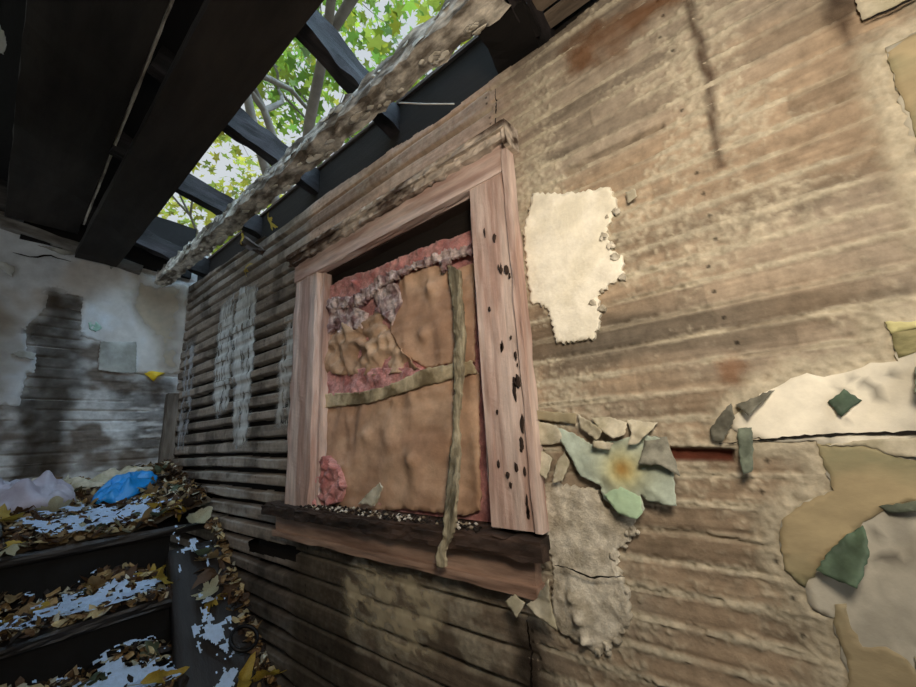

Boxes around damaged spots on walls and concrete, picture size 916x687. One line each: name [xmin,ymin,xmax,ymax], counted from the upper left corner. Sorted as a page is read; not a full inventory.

crack [863,0,912,21]
spalling [523,187,637,345]
leakage [12,292,81,481]
leakage [134,281,194,449]
leakage [213,287,256,446]
leakage [276,318,293,426]
crack [719,430,916,444]
peeling [827,389,862,417]
leakage [345,569,442,655]